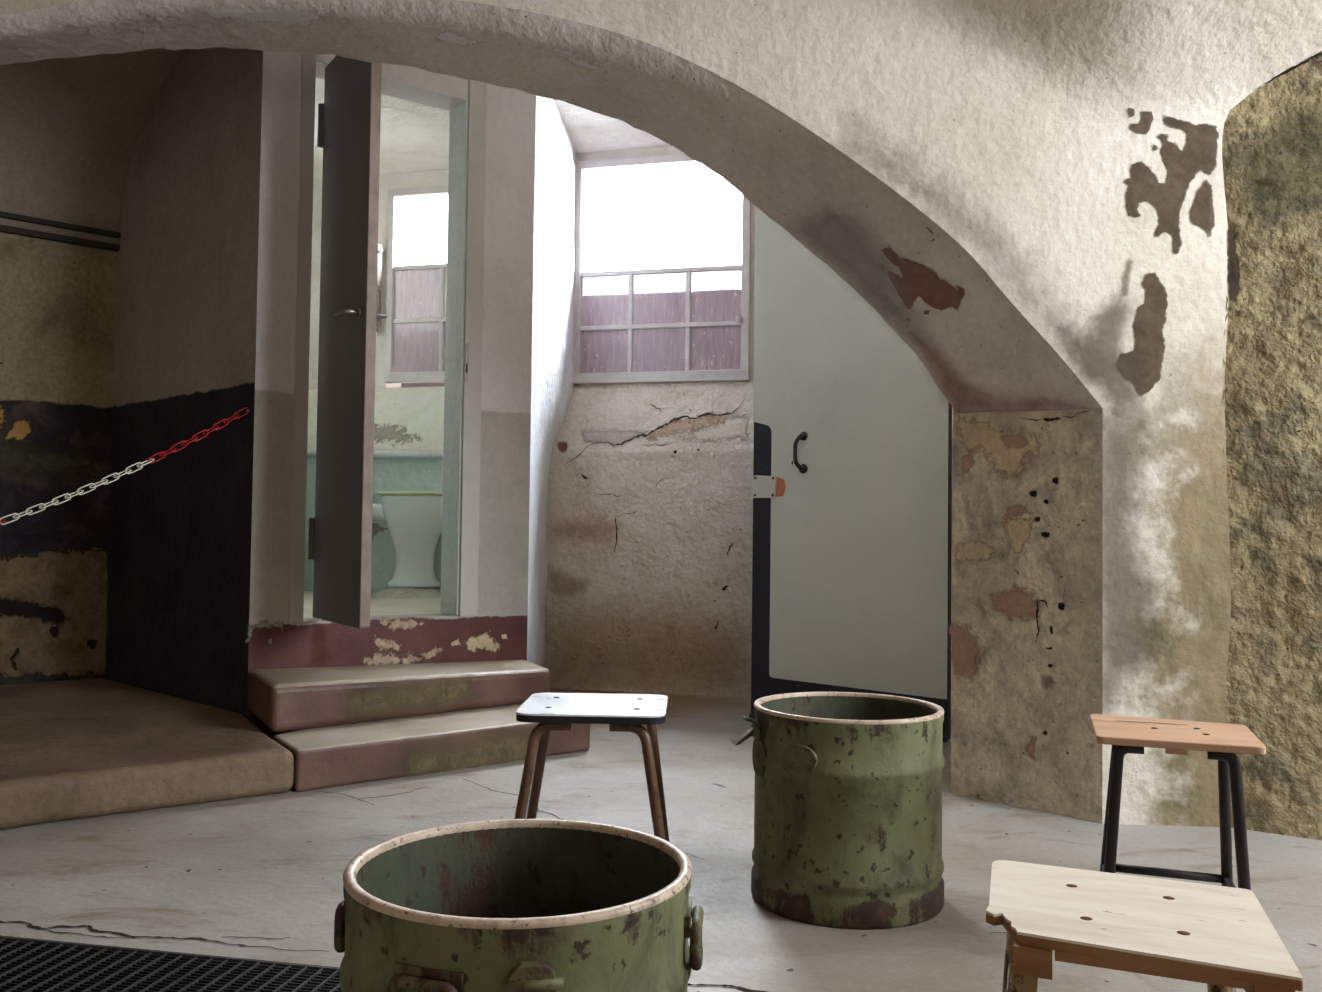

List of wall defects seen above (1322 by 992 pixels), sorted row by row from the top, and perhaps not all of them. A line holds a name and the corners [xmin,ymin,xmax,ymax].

peeling [1124,108,1241,316]
peeling [881,247,965,322]
leakage [1075,261,1135,404]
peeling [1117,273,1168,395]
crack [570,399,745,461]
crack [594,480,661,551]
spalling [1001,491,1050,554]
leakage [1099,424,1150,681]
spalling [0,545,107,679]
peeling [363,617,507,665]
spalling [992,585,1040,622]
crack [0,921,321,951]